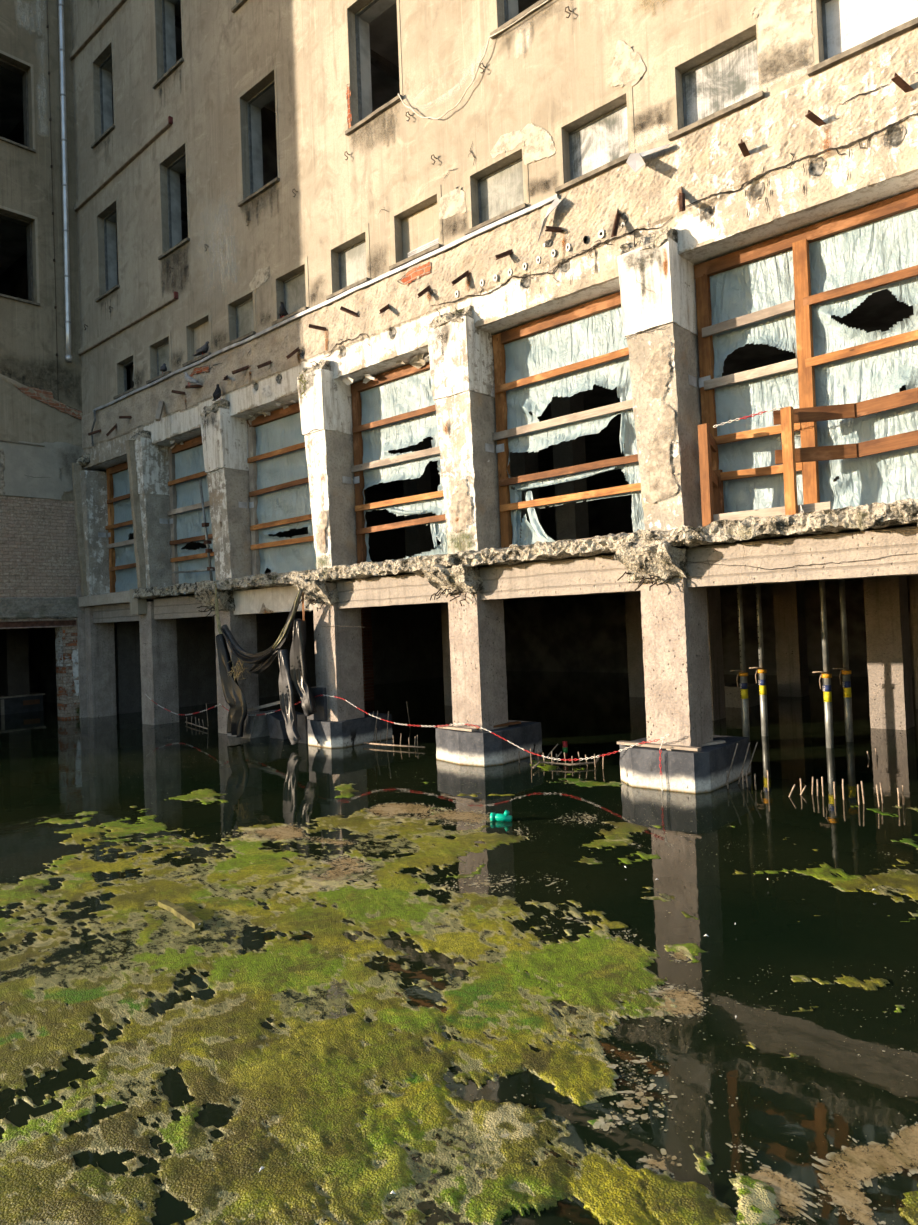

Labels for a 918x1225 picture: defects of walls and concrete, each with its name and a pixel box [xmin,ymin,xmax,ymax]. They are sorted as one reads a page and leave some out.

flaking render [490,123,556,165]
spalling [449,476,473,533]
spalling [132,498,918,620]